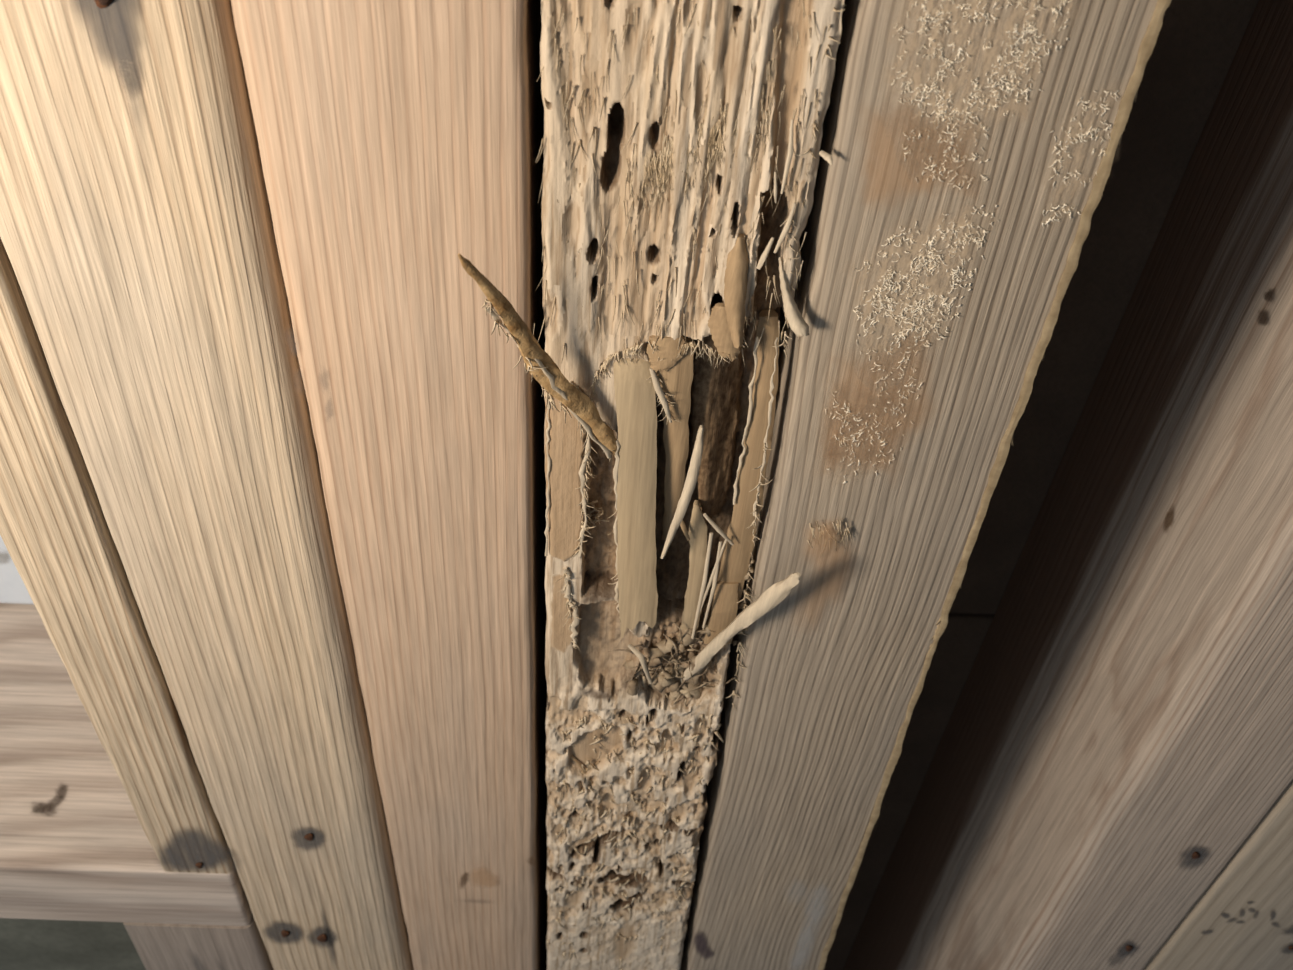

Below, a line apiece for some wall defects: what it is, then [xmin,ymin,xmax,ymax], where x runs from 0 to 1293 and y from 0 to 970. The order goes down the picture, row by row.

peeling [779,257,809,337]
hole [655,391,700,601]
spalling [704,234,758,598]
hole [548,818,703,911]